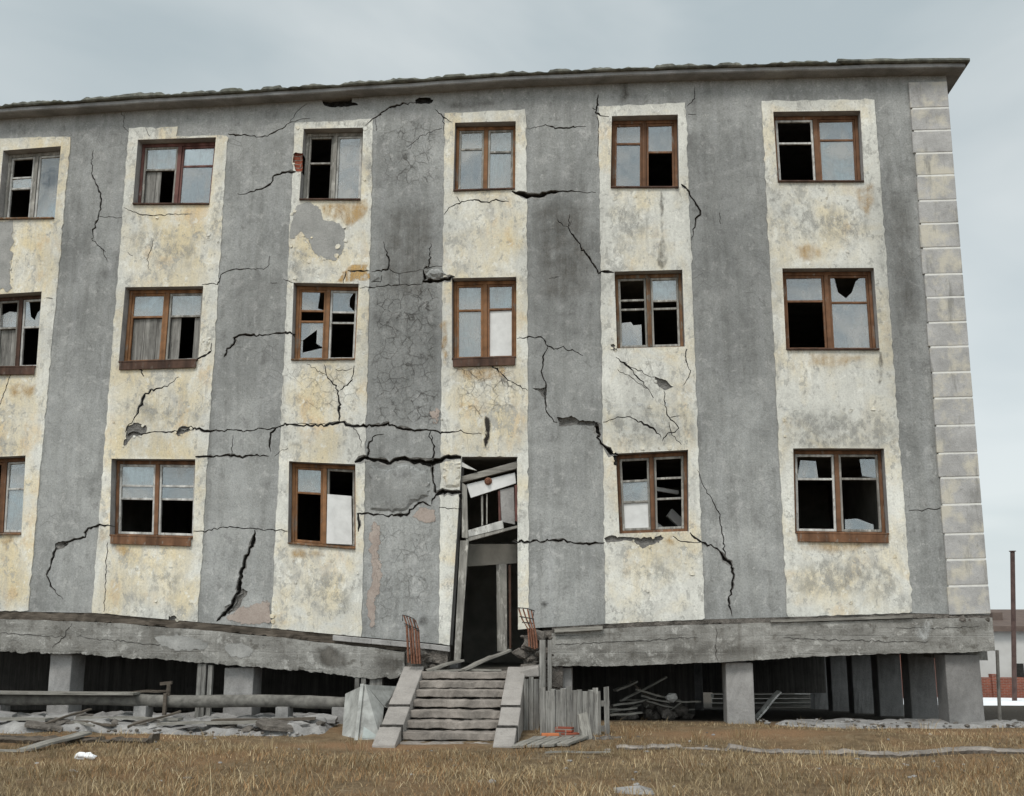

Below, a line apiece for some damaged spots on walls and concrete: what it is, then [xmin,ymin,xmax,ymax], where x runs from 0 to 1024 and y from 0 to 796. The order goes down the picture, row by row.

crack [229,104,309,137]
spalling [293,152,303,172]
crack [91,150,181,269]
peeling [289,202,347,279]
crack [444,190,614,274]
crack [681,184,721,239]
spalling [112,421,147,447]
crack [125,241,583,532]
crack [593,349,691,457]
crack [46,523,111,610]
crack [195,526,286,621]
crack [556,471,735,658]